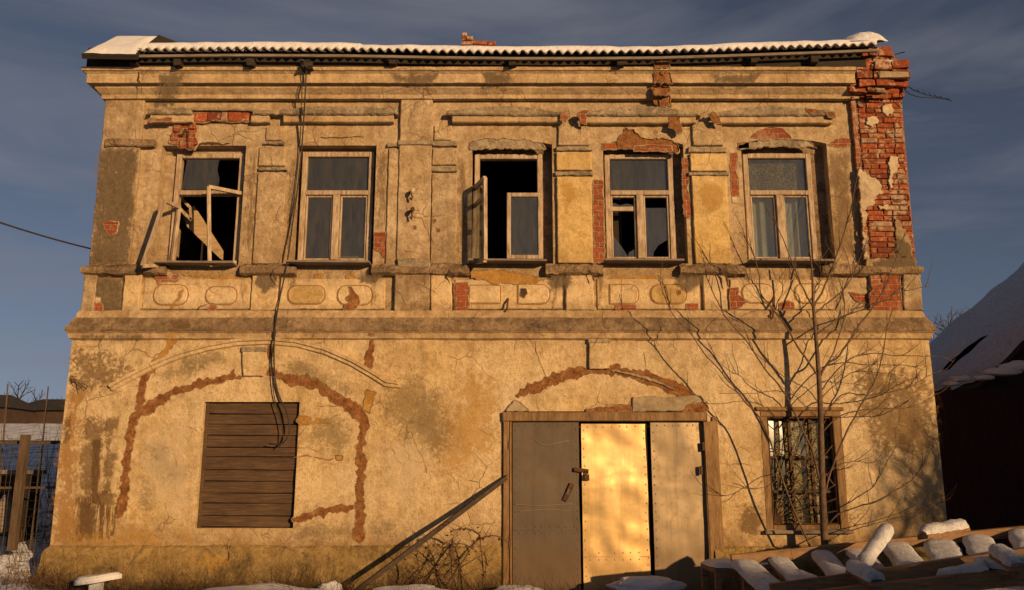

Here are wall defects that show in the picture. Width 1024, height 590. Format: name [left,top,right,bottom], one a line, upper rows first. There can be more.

flaking render [103,220,120,236]
flaking render [147,111,252,151]
flaking render [592,179,606,263]
flaking render [601,61,693,218]
flaking render [729,45,917,311]
water stain [73,417,118,542]